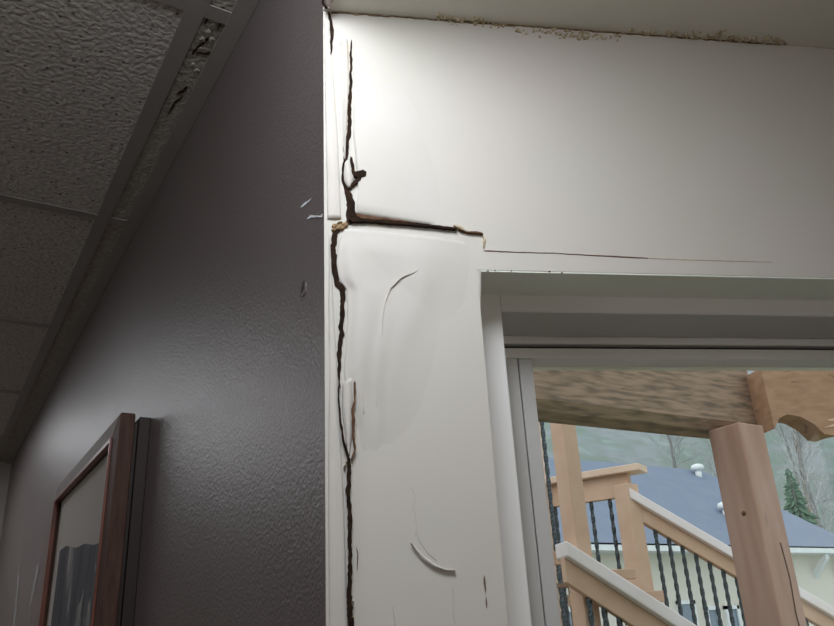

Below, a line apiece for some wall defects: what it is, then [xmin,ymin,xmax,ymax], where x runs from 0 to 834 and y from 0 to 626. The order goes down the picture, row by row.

crack [322,0,834,626]